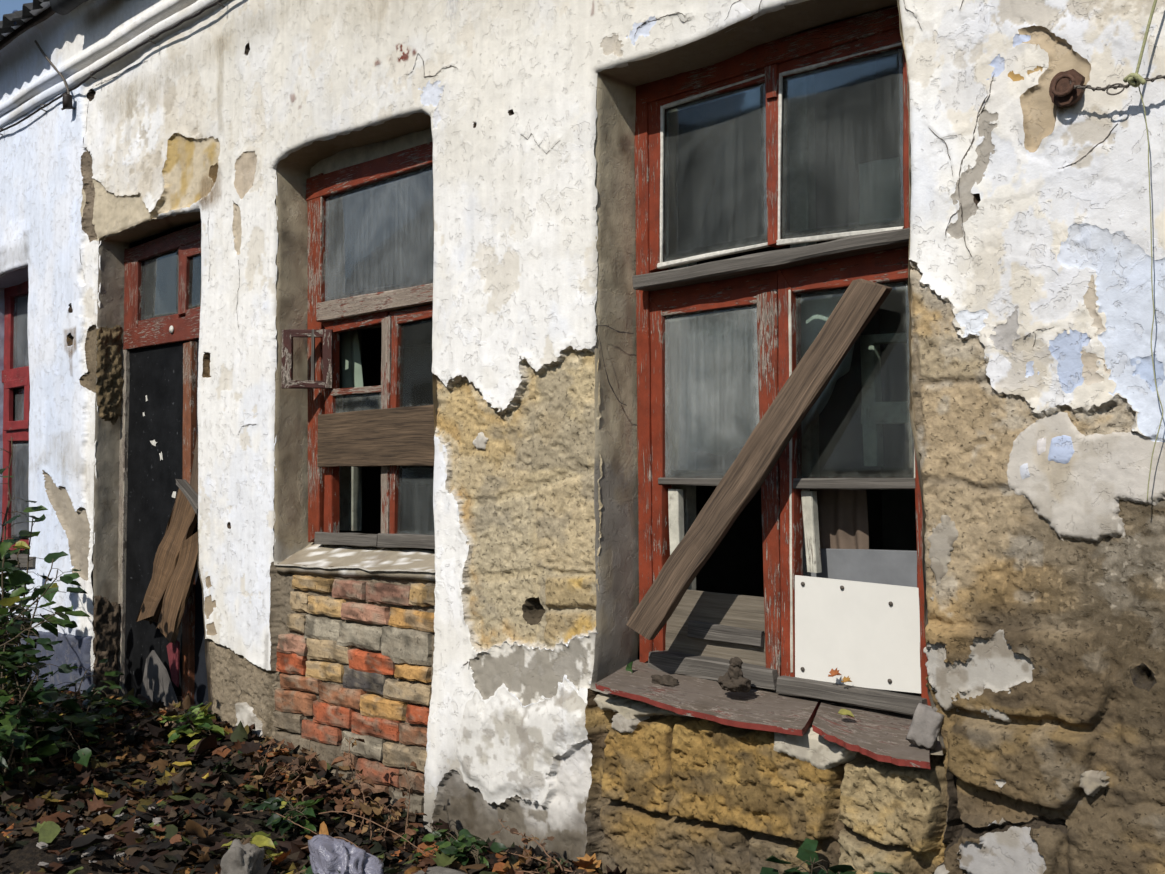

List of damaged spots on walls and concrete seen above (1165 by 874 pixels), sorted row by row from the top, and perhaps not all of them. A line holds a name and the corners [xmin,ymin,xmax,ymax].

spalling [80,133,220,242]
peeling [232,151,257,255]
crack [929,75,994,257]
spalling [986,25,1091,152]
crack [1058,123,1118,169]
spalling [79,325,124,425]
spalling [42,470,91,581]
spalling [433,345,691,733]
spalling [910,223,1165,874]
spalling [430,739,592,868]